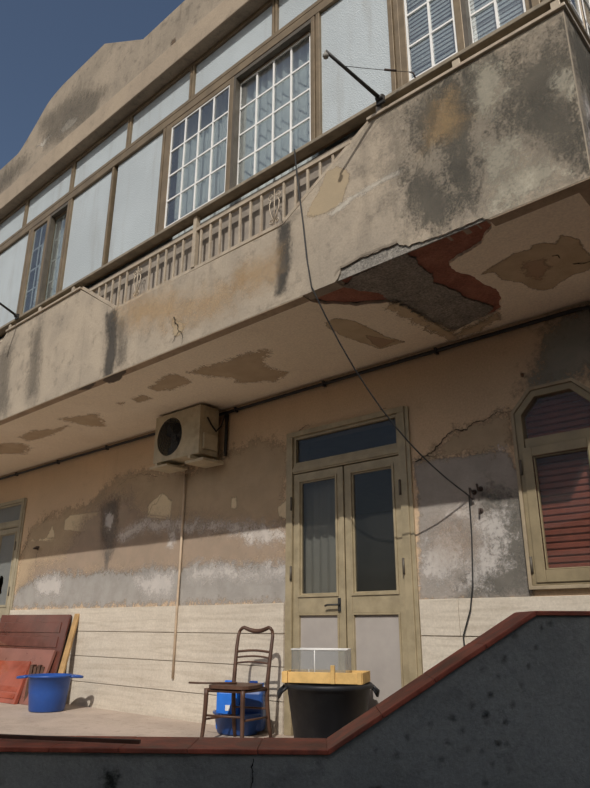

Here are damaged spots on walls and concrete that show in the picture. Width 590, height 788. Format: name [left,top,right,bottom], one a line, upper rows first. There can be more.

damp [400,20,590,229]
flaking render [307,166,403,217]
damp [276,222,290,295]
spalling [318,219,590,341]
damp [103,309,118,377]
crack [171,317,184,344]
peeling [119,349,287,405]
peeling [326,318,404,349]
peeling [0,414,105,455]
peeling [16,435,286,592]
damp [34,498,286,579]